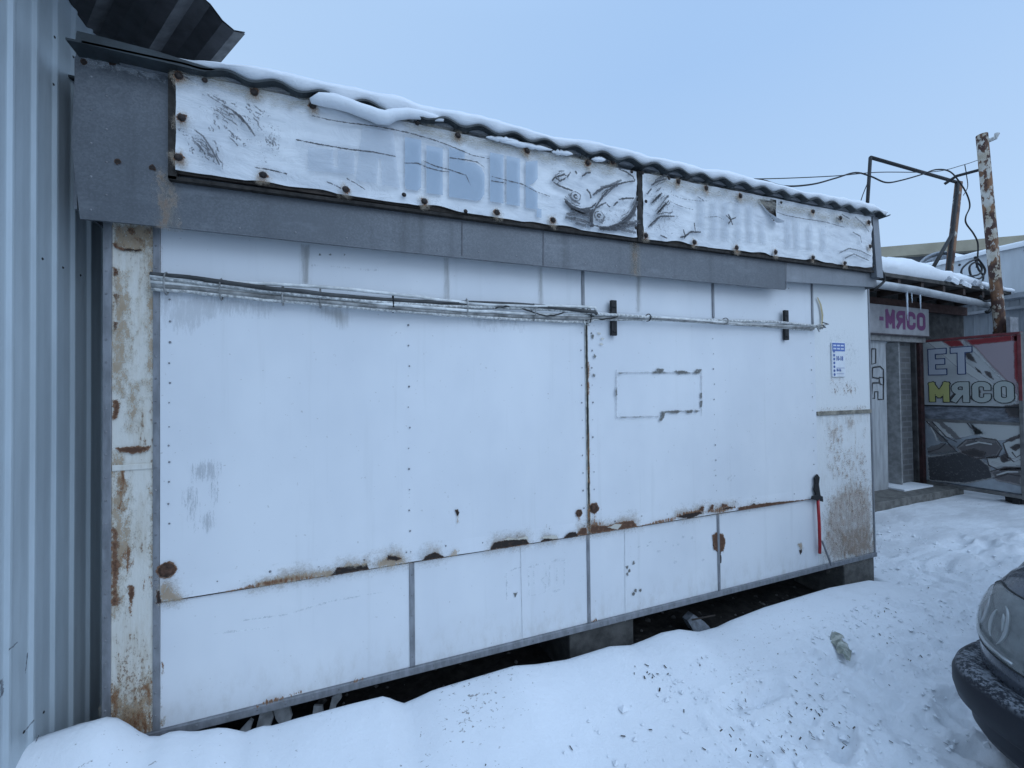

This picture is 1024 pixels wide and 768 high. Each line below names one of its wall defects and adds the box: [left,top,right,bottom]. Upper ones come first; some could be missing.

rust [112,256,153,430]
rust [111,445,182,618]
rust [378,554,404,567]
rust [575,499,809,534]
rust [712,532,725,563]
rust [218,570,333,593]
rust [111,652,165,733]